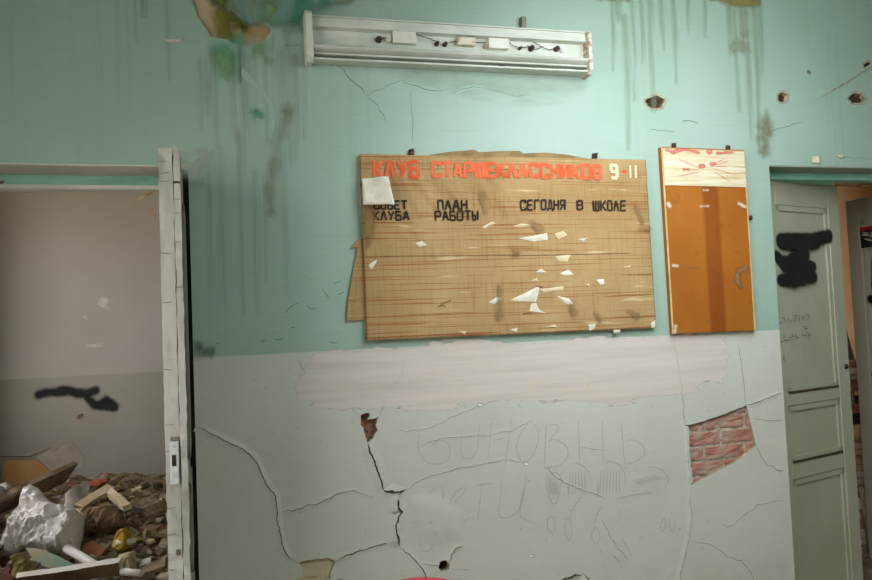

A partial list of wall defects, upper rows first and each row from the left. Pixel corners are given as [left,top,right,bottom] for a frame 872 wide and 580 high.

peeling [191,0,219,38]
peeling [230,22,271,47]
spalling [815,60,872,105]
spalling [644,94,667,110]
crack [295,355,535,448]
spalling [361,413,376,441]
flaking render [685,406,754,484]
crack [673,341,787,580]
crack [194,421,524,580]
spalling [298,558,335,580]
crack [552,568,598,580]